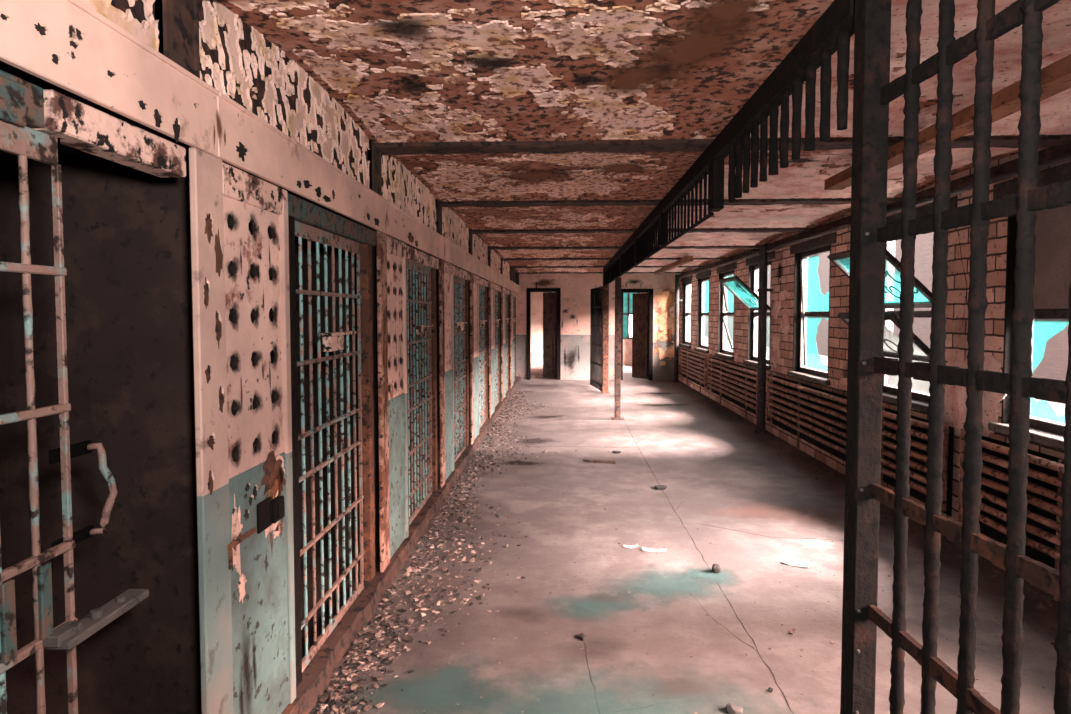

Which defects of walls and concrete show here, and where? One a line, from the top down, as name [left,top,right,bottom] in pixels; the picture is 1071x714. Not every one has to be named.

peeling [79,0,159,51]
peeling [752,0,773,11]
peeling [199,0,720,279]
peeling [232,451,286,603]
crack [554,419,844,714]